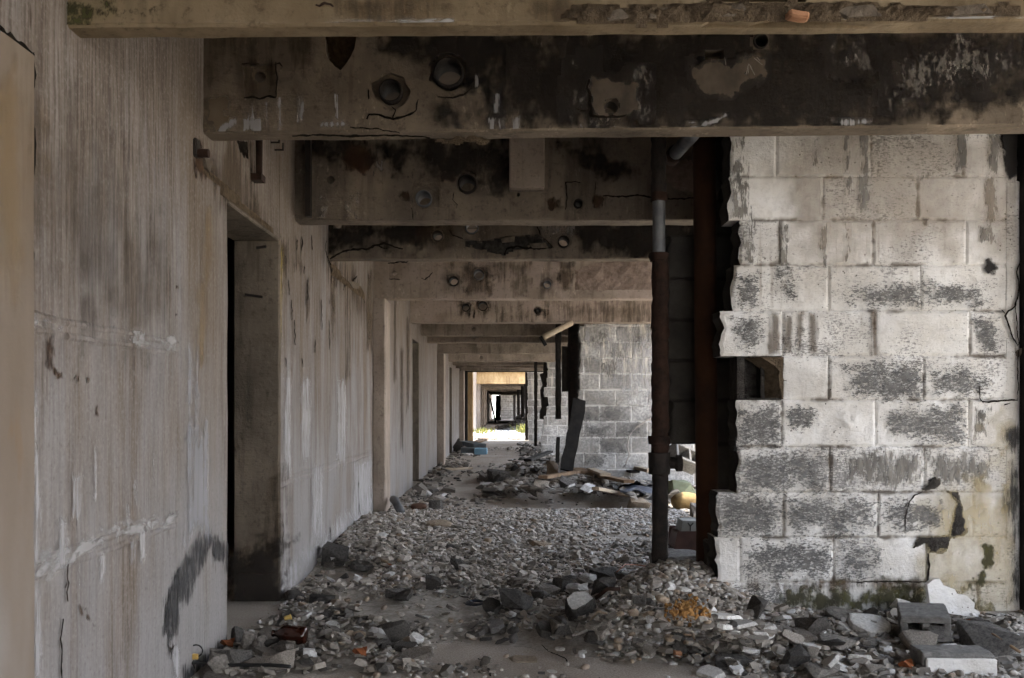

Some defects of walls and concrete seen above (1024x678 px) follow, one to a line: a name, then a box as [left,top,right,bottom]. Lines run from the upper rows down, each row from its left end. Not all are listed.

spalling [561,0,1021,28]
crack [292,80,475,139]
crack [325,241,432,303]
peeling [465,234,552,256]
peeling [728,137,799,353]
peeling [718,358,993,603]
crack [904,491,923,528]